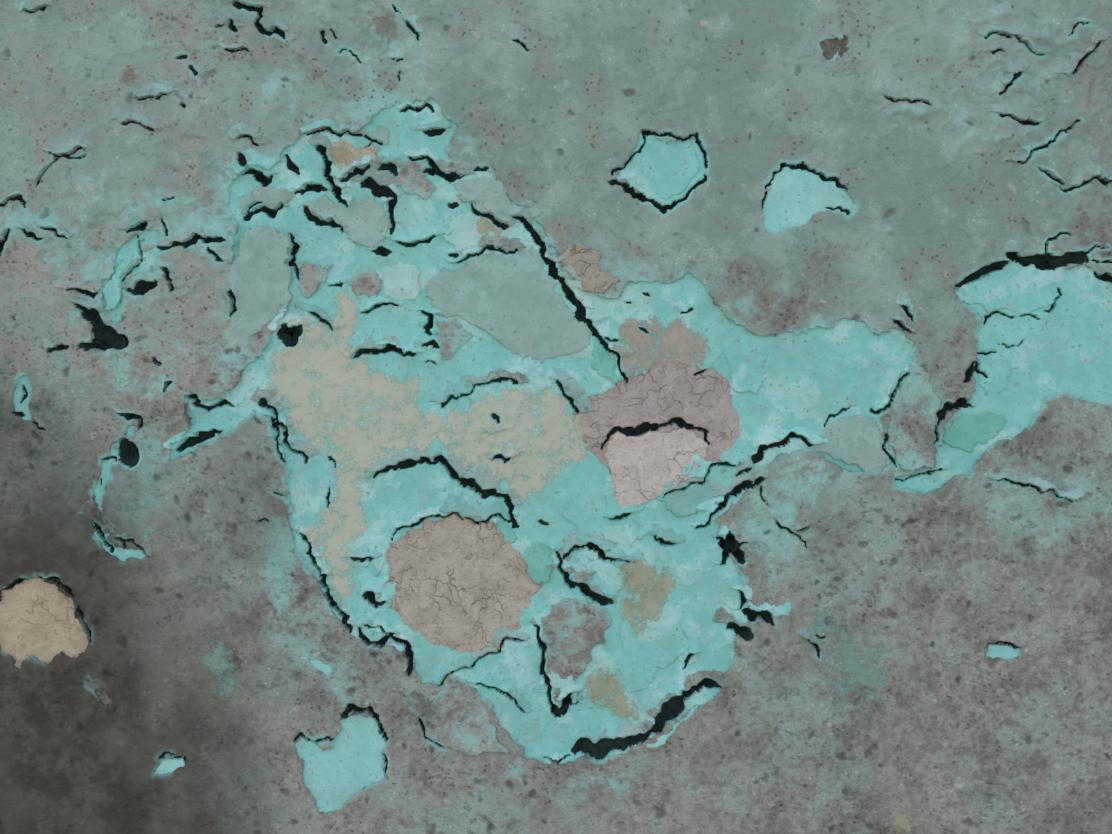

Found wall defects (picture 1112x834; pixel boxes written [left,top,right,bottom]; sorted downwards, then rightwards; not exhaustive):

peeling [55,98,1112,765]
spalling [0,574,92,669]
peeling [294,703,389,813]